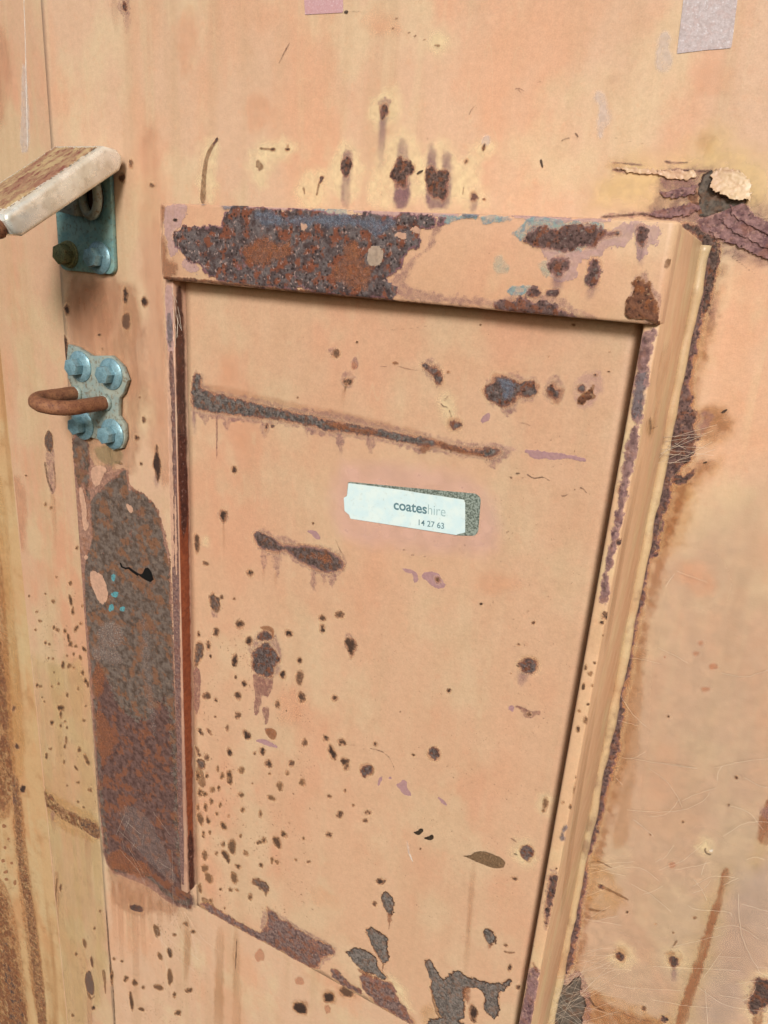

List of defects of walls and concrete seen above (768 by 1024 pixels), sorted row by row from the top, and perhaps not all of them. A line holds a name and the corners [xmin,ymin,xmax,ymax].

spalling [608,147,768,259]
corrosion [493,216,662,317]
corrosion [484,375,561,408]
corrosion [34,154,500,1024]
corrosion [555,224,727,1024]
corrosion [544,868,558,927]
corrosion [424,929,540,1024]